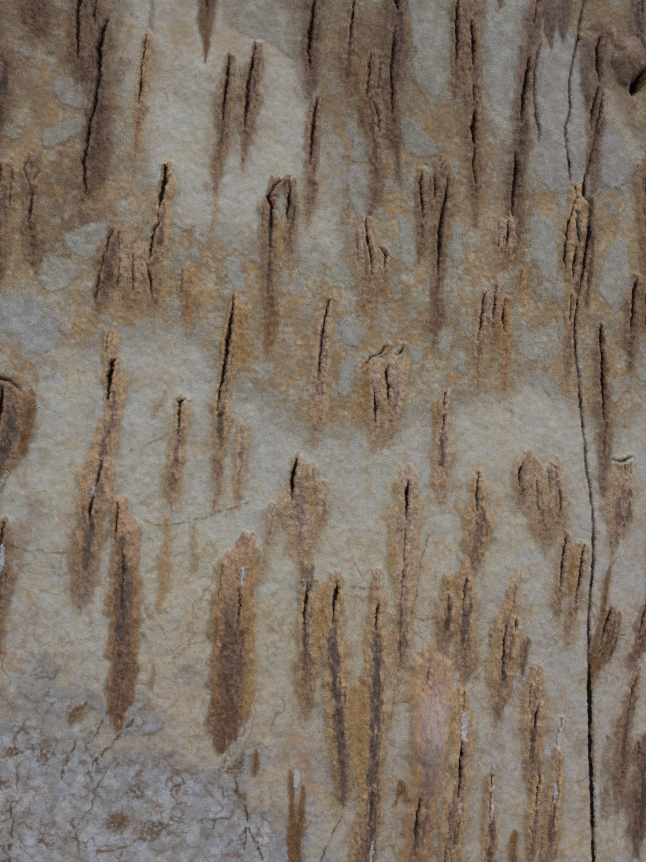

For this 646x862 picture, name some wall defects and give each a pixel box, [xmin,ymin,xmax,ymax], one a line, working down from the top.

corrosion [260,0,323,352]
corrosion [493,0,572,269]
corrosion [561,184,596,391]
crack [7,805,15,862]
corrosion [0,373,37,489]
crack [61,718,134,780]
corrosion [70,329,143,732]
water stain [0,661,289,862]
crack [232,772,263,860]
corrosion [206,452,499,862]
corrosion [485,581,566,862]
crack [564,3,595,862]